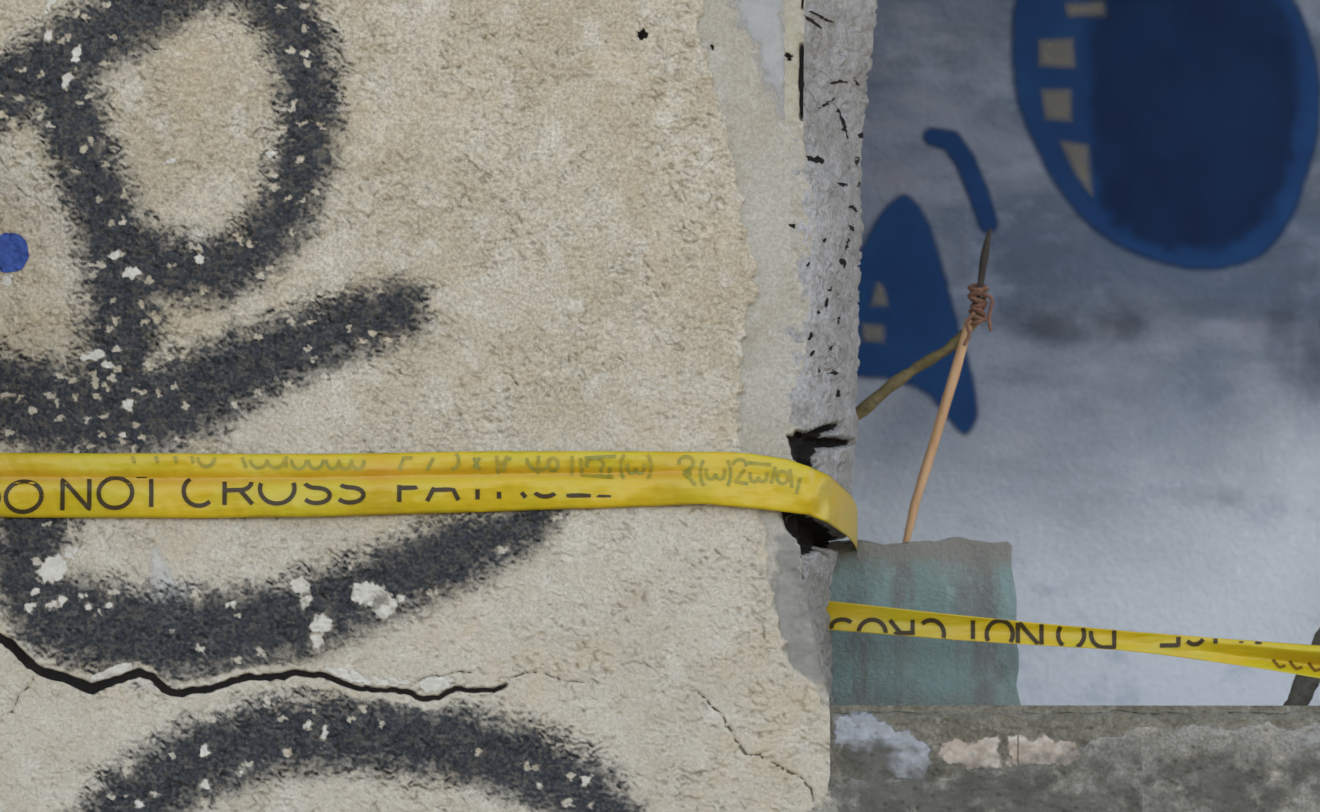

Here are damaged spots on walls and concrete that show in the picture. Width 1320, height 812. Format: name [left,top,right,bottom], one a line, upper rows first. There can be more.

crack [799,0,860,139]
crack [0,634,586,716]